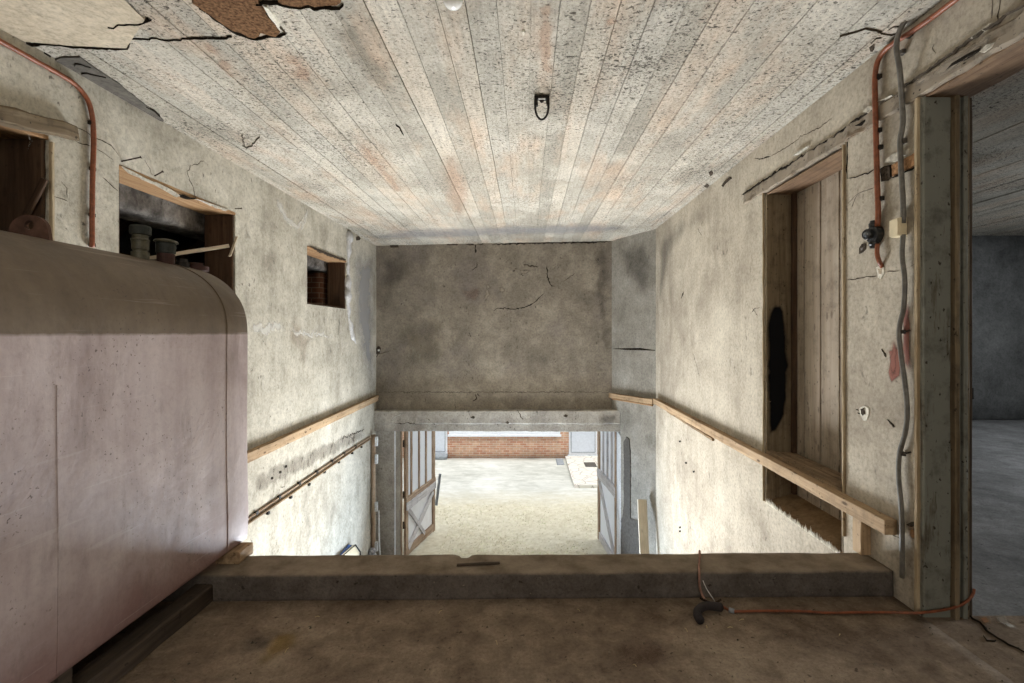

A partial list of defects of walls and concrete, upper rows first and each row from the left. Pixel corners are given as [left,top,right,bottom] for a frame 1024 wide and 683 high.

peeling [0,0,151,51]
spalling [192,0,344,41]
crack [840,26,899,44]
spalling [904,5,1024,87]
spalling [848,149,914,182]
crack [473,241,610,311]
crack [615,345,655,353]